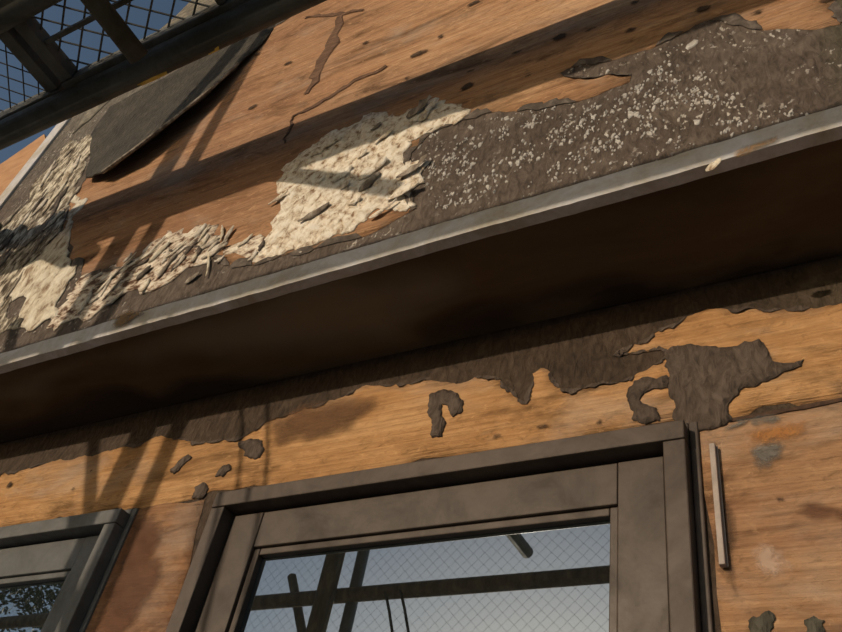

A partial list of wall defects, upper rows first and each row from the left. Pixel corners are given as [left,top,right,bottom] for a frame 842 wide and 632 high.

crack [282,9,388,143]
peeling [0,0,842,334]
water stain [274,401,372,442]
peeling [0,303,842,632]
water stain [95,521,158,632]